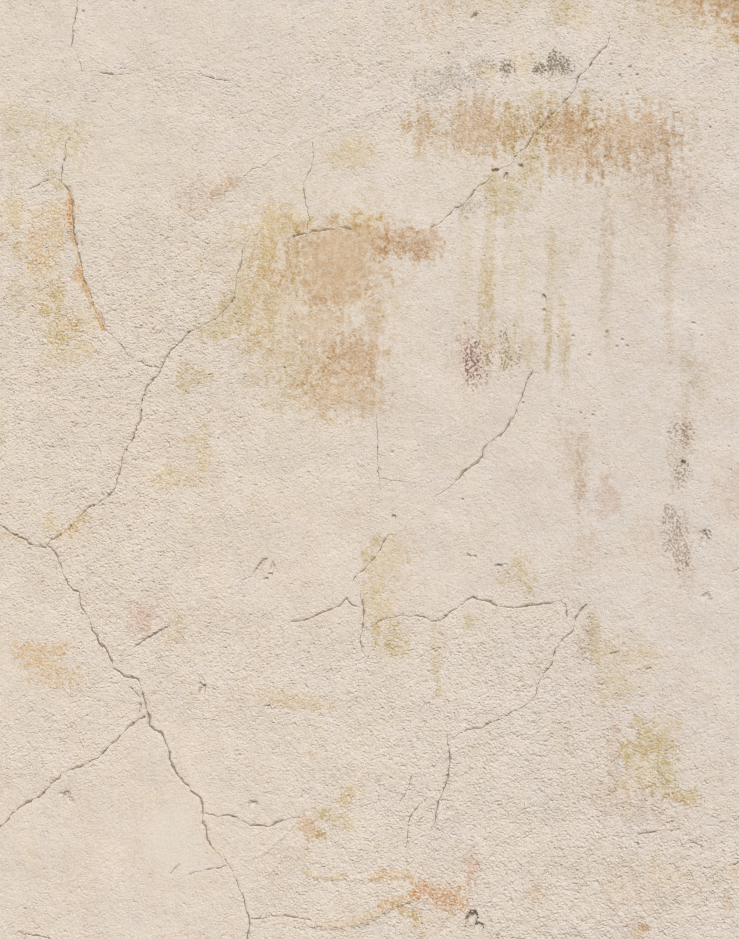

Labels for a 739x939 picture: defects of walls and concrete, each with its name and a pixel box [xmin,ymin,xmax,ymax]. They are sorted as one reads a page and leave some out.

corrosion [0,200,100,368]
crack [288,143,351,239]
crack [431,36,610,228]
crack [437,371,533,495]
crack [0,138,310,939]
crack [291,534,588,845]